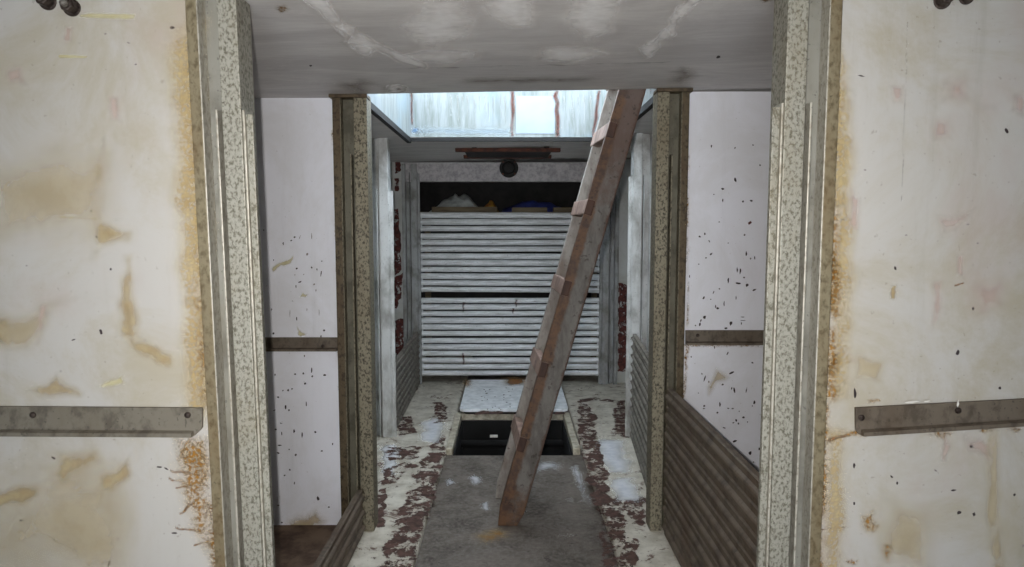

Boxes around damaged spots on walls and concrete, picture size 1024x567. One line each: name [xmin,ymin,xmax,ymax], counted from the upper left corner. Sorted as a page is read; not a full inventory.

damp [98,225,120,242]
damp [122,276,170,364]
rust [173,38,207,407]
rust [820,65,857,567]
rust [169,442,215,567]
peeling [376,389,513,567]
peeling [541,399,646,567]